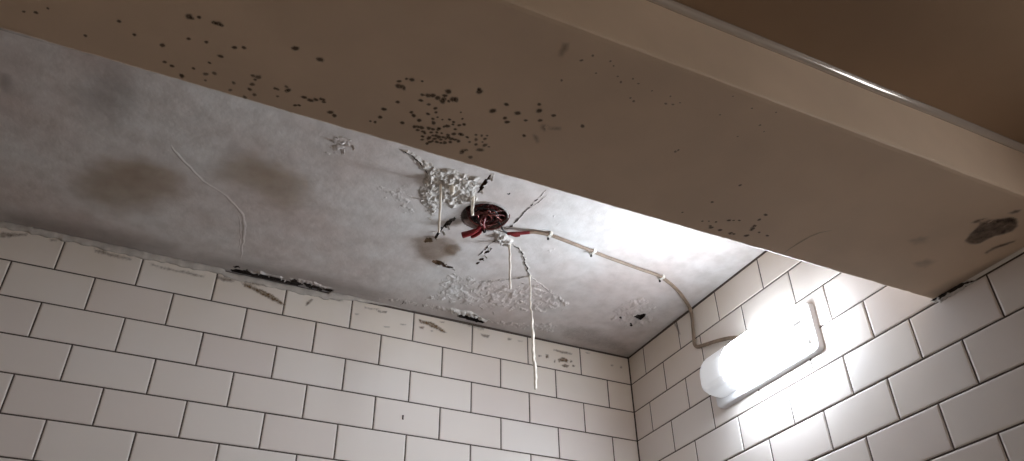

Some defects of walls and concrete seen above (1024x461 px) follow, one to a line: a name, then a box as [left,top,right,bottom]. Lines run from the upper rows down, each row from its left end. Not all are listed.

leakage [369,78,490,158]
crack [170,144,333,292]
flaking render [410,157,495,243]
crack [478,191,554,296]
peeling [425,260,570,323]